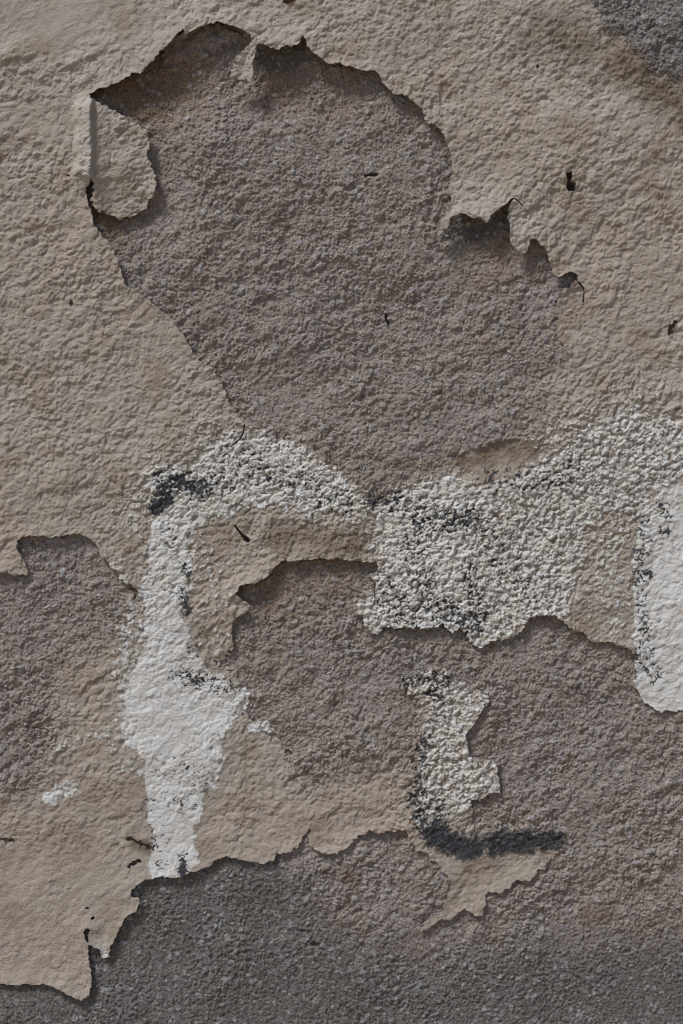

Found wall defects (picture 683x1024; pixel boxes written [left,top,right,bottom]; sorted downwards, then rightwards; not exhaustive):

peeling [81,21,578,496]
peeling [591,0,683,91]
peeling [0,533,683,1024]